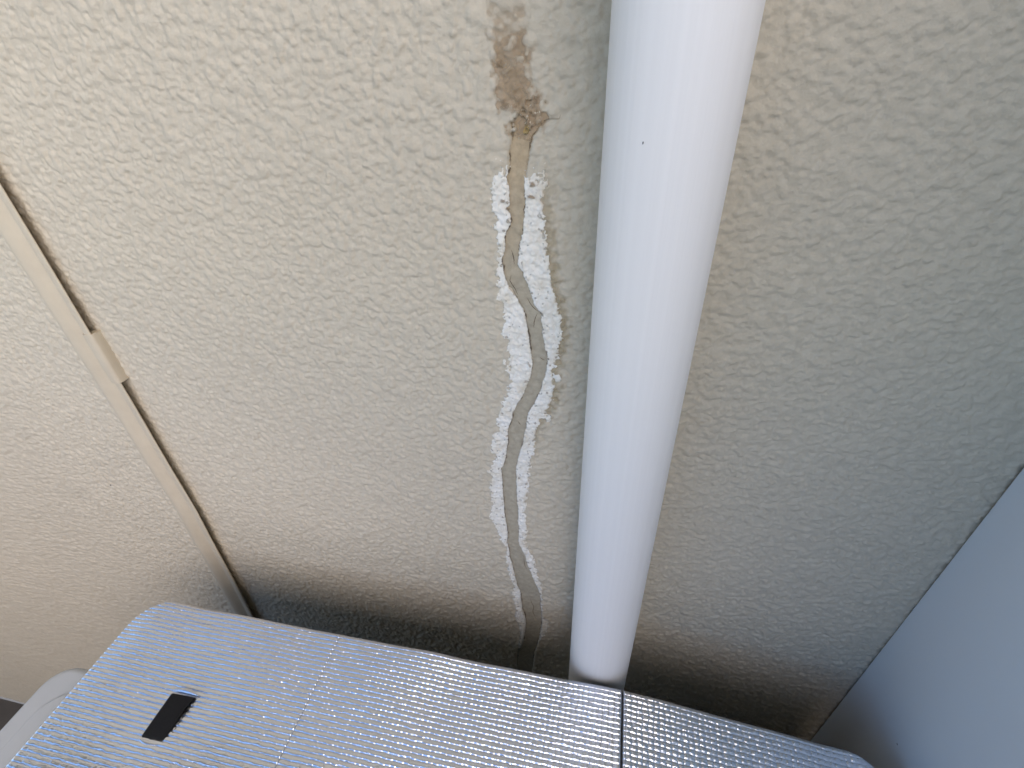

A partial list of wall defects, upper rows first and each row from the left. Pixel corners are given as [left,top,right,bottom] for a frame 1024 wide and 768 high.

crack [487,102,563,673]